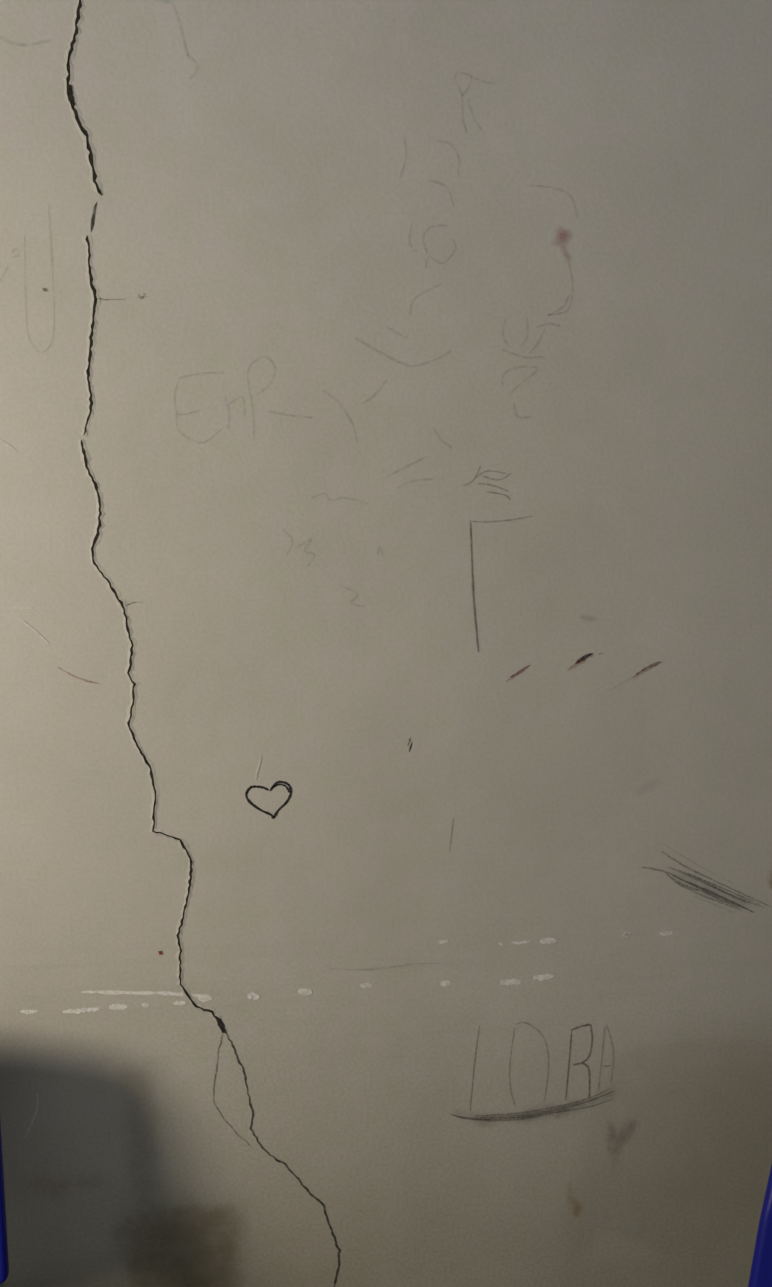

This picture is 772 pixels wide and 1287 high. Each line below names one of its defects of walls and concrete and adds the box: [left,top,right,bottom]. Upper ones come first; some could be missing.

crack [62,0,341,1286]